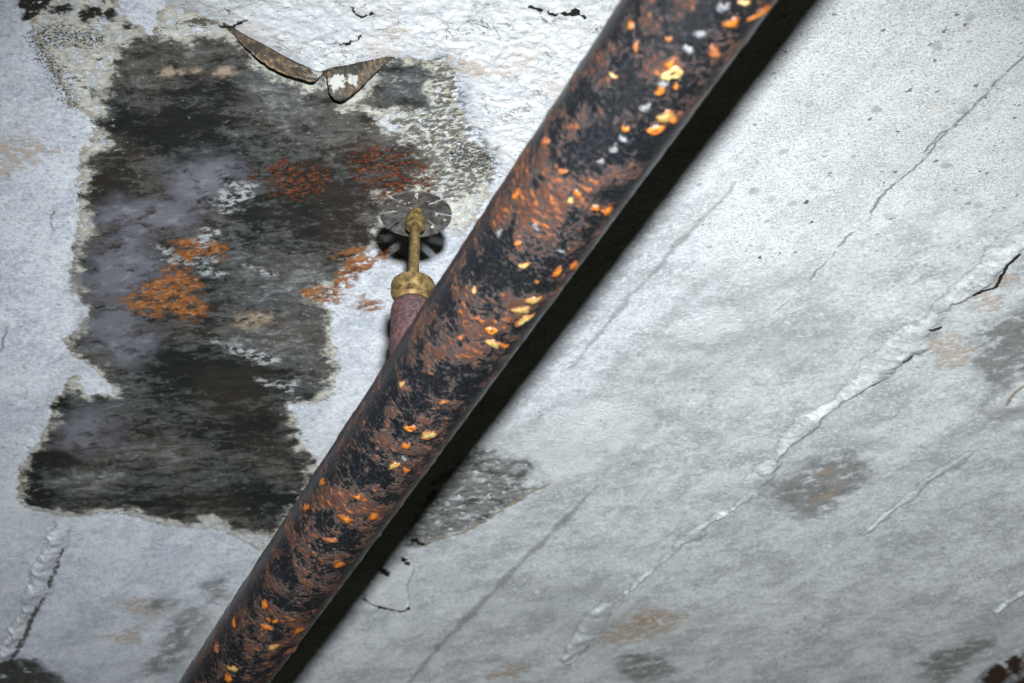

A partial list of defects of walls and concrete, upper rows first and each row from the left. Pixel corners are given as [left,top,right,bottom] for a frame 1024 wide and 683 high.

mould [18,0,116,108]
rust [348,141,439,202]
mould [391,56,497,201]
crack [870,56,1024,212]
leakage [75,160,258,366]
rust [118,238,229,321]
efflorescence [211,341,281,365]
peeling [16,0,620,551]
rust [299,244,403,304]
rust [357,300,382,311]
crack [972,254,1021,296]
crack [9,548,64,661]